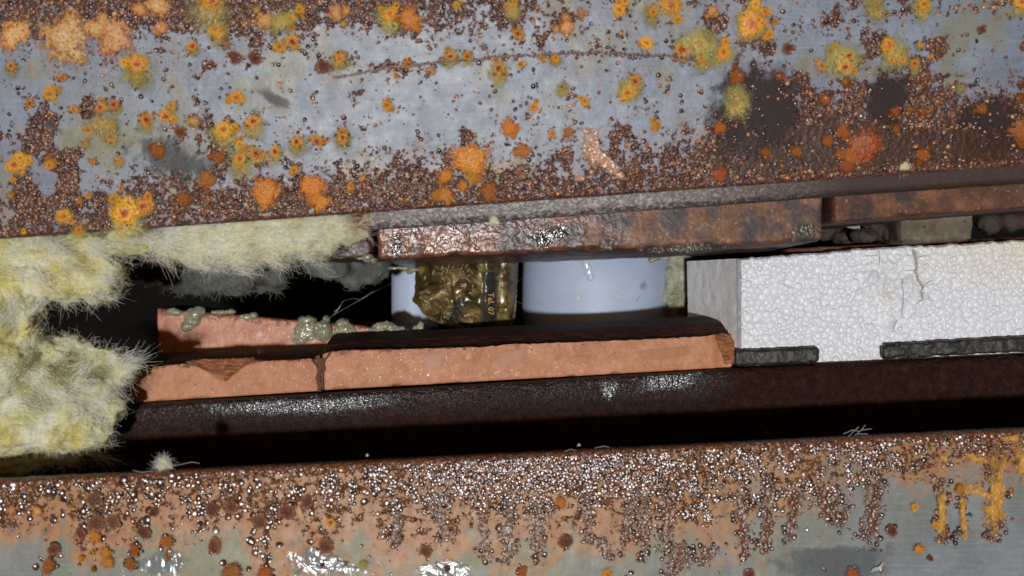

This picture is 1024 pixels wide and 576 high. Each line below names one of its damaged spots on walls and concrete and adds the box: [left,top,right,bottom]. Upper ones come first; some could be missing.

rust [0,0,1024,242]
crack [892,249,933,333]
rust [0,433,1024,576]